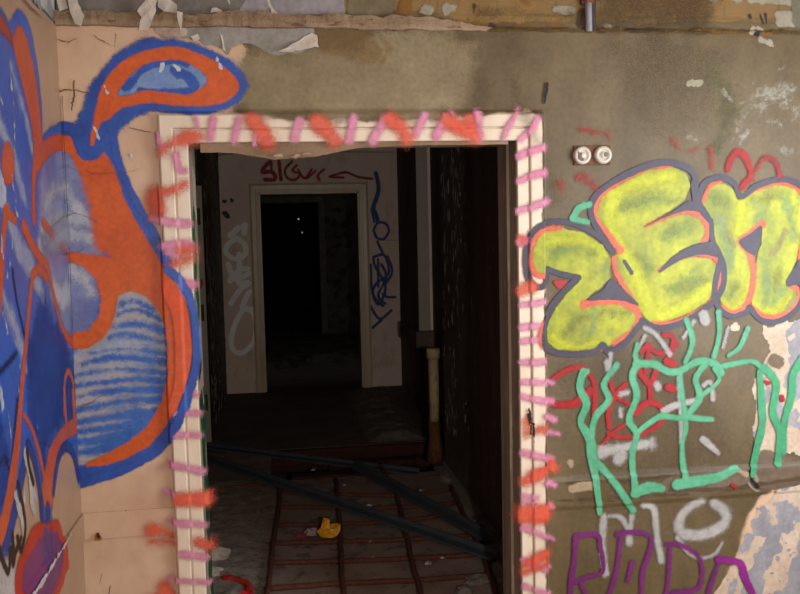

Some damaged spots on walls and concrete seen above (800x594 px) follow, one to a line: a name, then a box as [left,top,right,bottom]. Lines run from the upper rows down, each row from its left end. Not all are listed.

peeling [33,0,84,26]
peeling [137,0,319,70]
peeling [419,1,458,17]
peeling [552,5,576,15]
peeling [732,0,800,47]
damp [229,13,800,303]
peeling [752,319,800,456]
damp [543,273,800,594]
peeling [714,483,800,594]